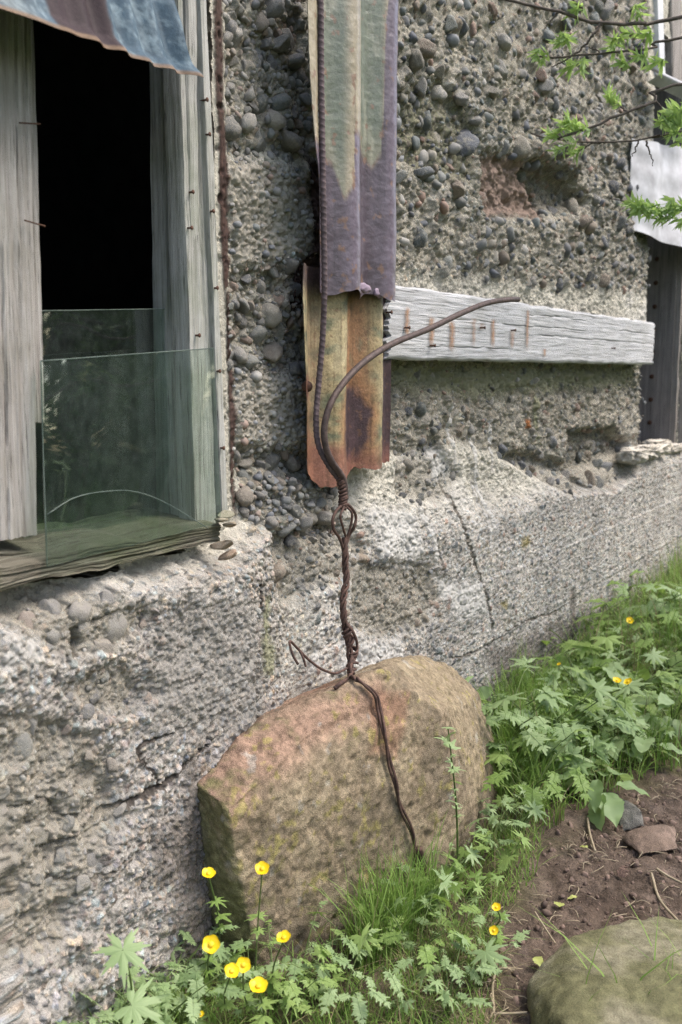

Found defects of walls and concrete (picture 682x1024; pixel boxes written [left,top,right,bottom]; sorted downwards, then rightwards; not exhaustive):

corrosion [214,0,237,506]
spalling [392,360,646,506]
crack [422,480,577,659]
crack [6,722,214,849]